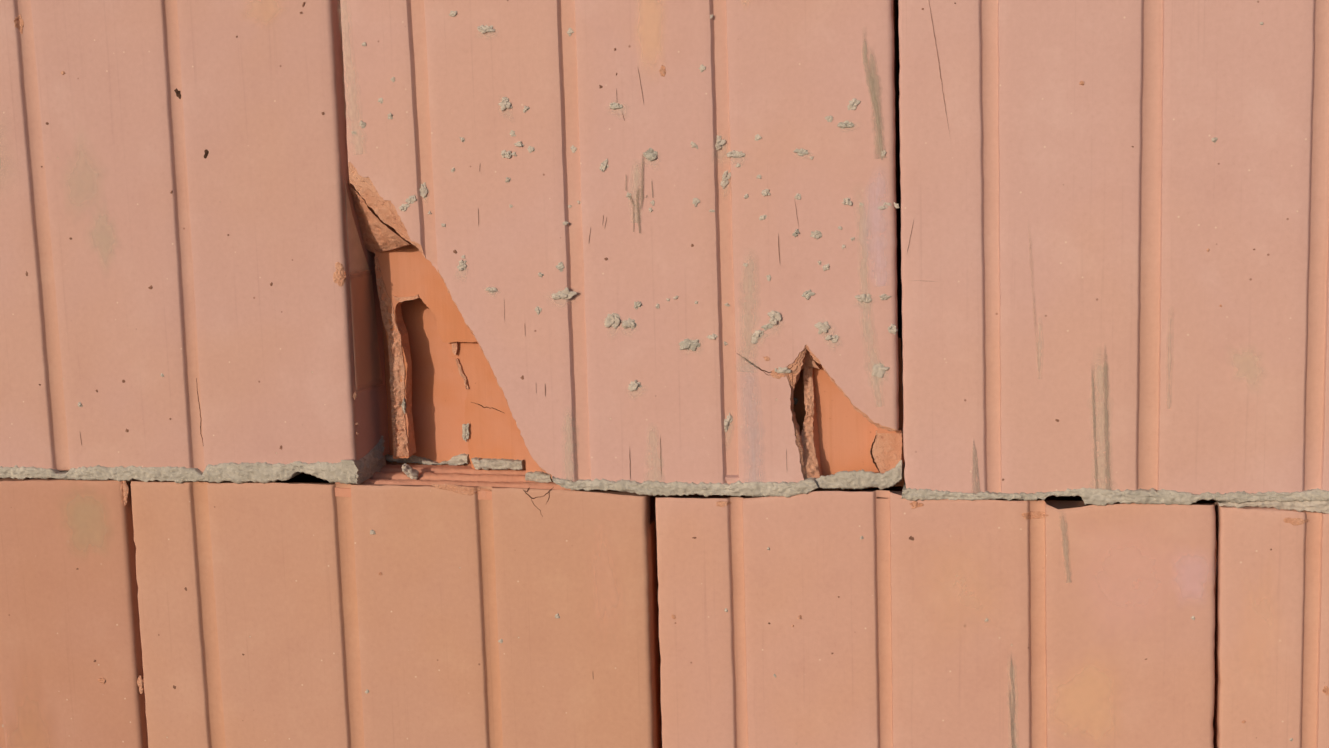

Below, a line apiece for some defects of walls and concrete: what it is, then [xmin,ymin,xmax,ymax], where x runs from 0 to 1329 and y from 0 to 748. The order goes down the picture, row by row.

spalling [347,180,546,473]
crack [735,351,784,375]
spalling [763,337,905,492]